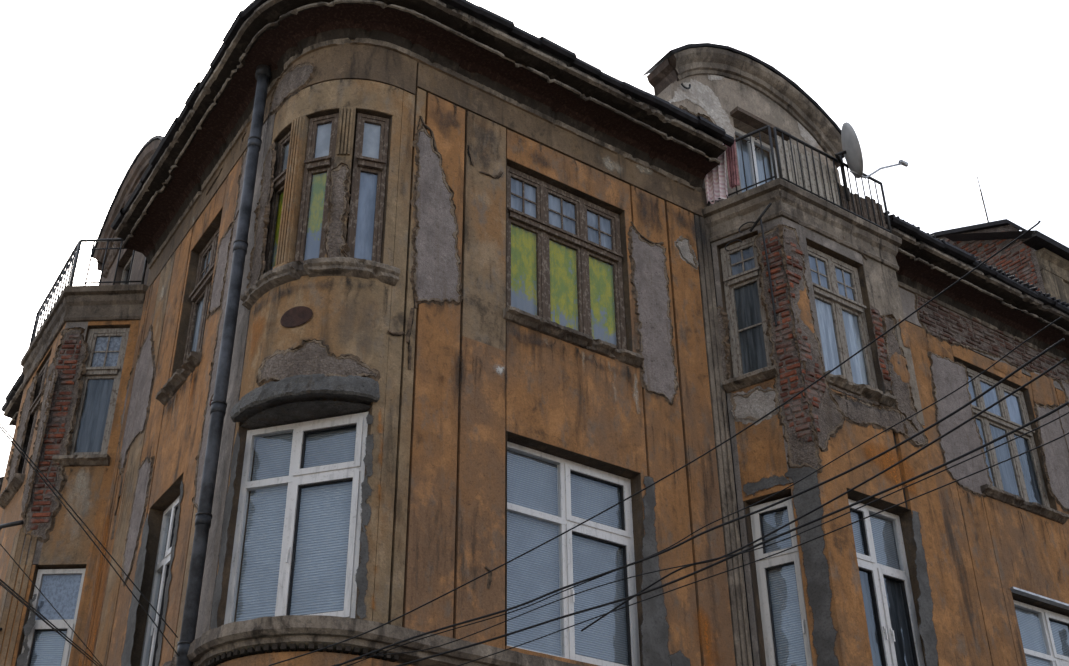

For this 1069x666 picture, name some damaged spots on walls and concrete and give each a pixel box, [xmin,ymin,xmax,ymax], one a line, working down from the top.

peeling [269,62,317,117]
peeling [410,123,463,306]
flaking render [6,327,89,543]
peeling [118,324,156,475]
peeling [121,456,155,586]
peeling [192,142,277,510]
peeling [256,338,381,387]
peeling [627,226,698,406]
peeling [730,224,1069,511]